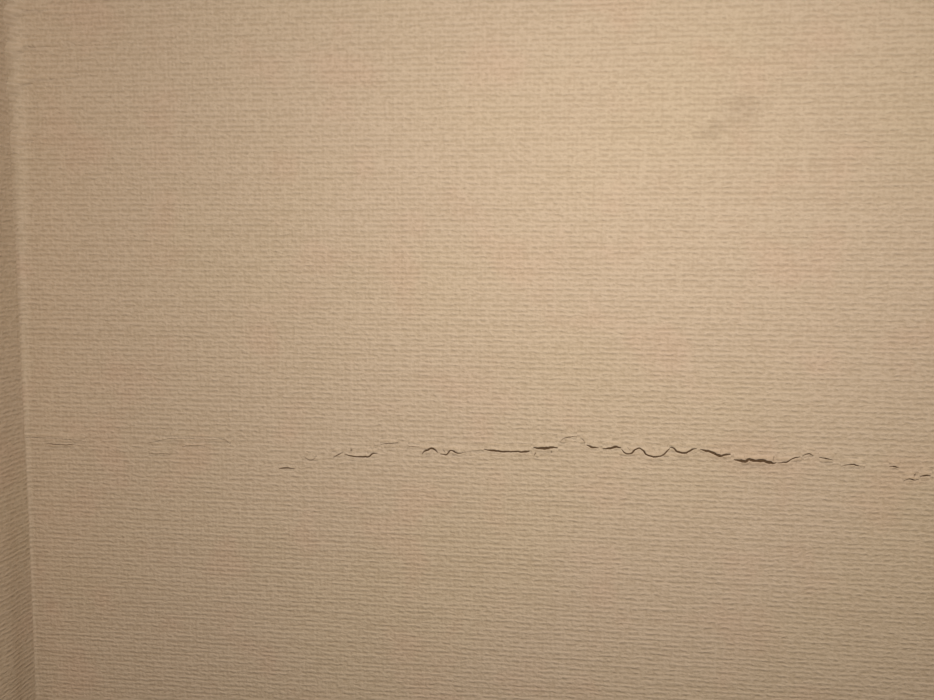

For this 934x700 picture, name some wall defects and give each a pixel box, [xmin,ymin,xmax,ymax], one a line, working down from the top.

crack [277,430,933,485]